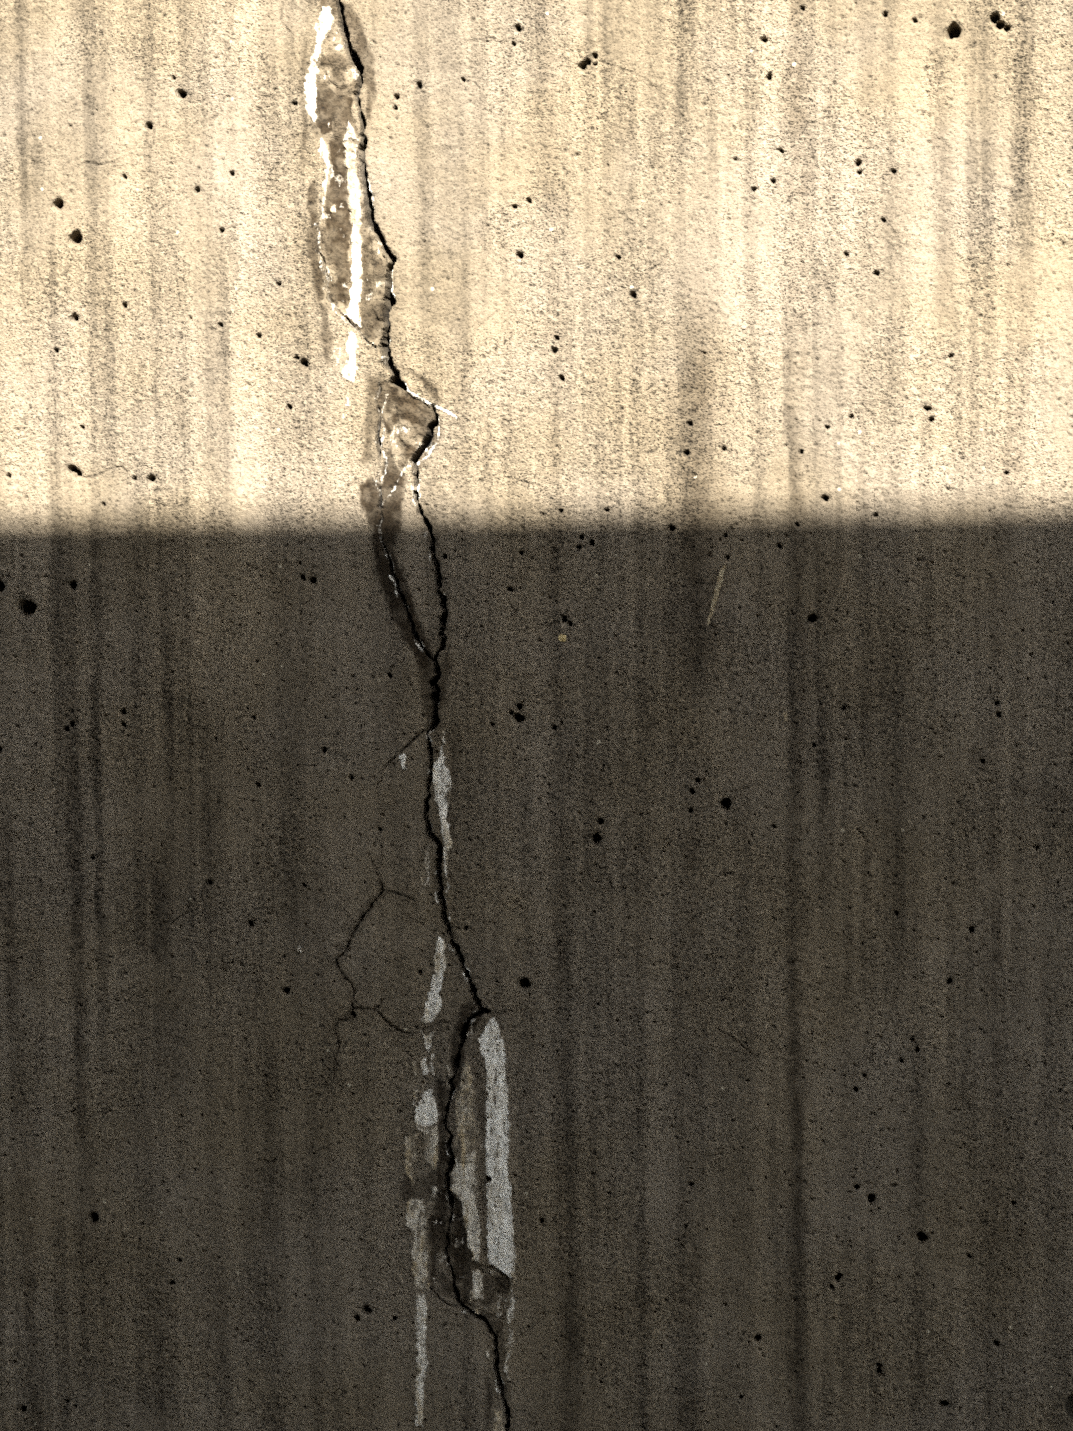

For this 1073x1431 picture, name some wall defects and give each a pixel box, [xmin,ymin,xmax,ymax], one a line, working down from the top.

crack [279,0,305,74]
spalling [310,0,393,345]
water stain [297,0,461,924]
crack [315,0,522,1431]
water stain [399,937,519,1431]
spalling [437,1019,511,1324]